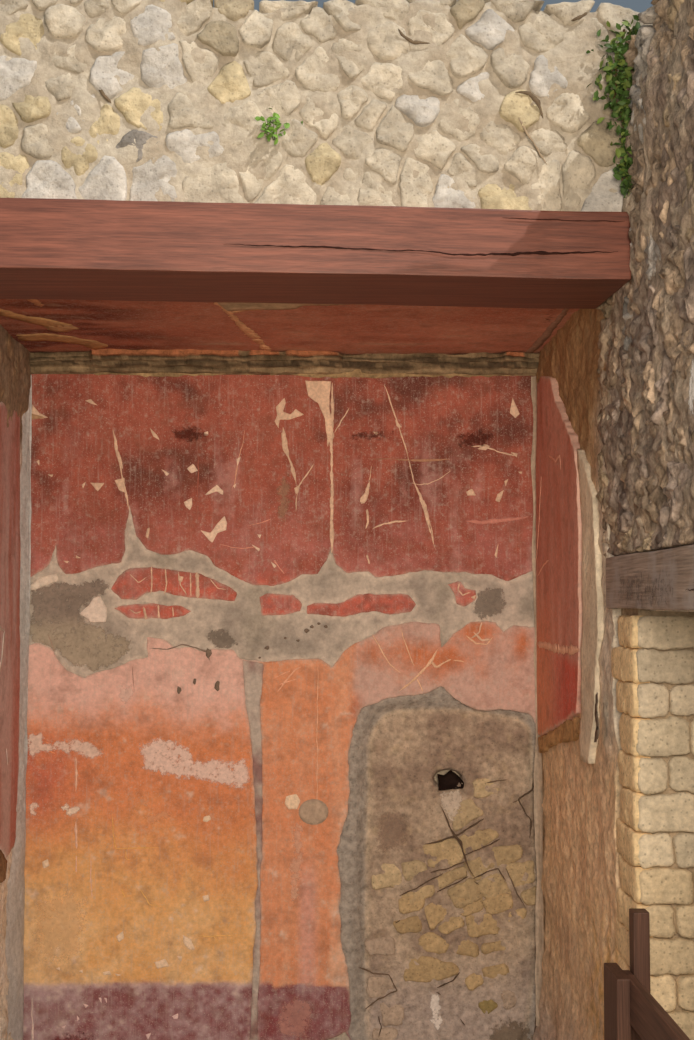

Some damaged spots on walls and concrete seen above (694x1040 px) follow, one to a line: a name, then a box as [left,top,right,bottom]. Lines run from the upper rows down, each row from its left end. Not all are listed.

peeling [217,302,362,311]
flaking render [0,309,108,471]
spalling [291,369,517,378]
peeling [29,506,535,678]
spalling [329,309,623,1040]
peeling [285,794,300,809]
crack [396,805,525,923]
crack [487,775,534,838]
flaking render [0,849,23,1040]
crack [360,967,397,1035]